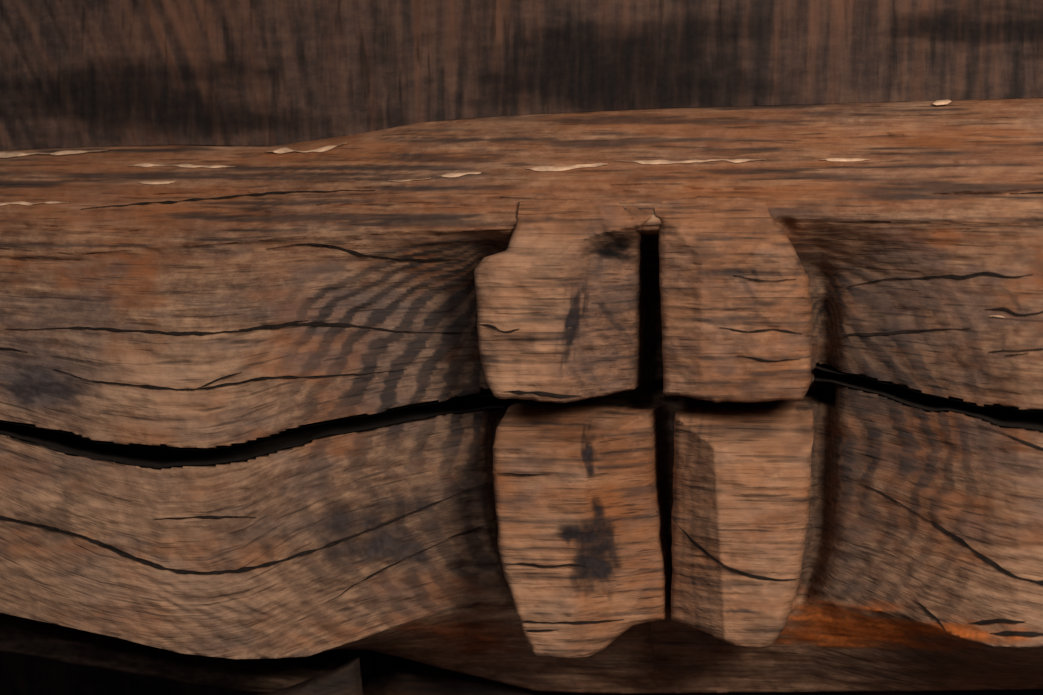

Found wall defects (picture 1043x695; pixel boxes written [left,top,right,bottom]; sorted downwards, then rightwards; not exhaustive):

crack [84,190,374,209]
crack [268,243,478,264]
crack [826,271,1033,295]
crack [0,320,518,352]
crack [53,369,405,390]
crack [719,307,1043,450]
crack [0,391,580,468]
crack [0,473,544,574]
crack [821,462,1043,585]
crack [675,521,799,581]
crack [514,619,624,632]
crack [971,619,1043,637]